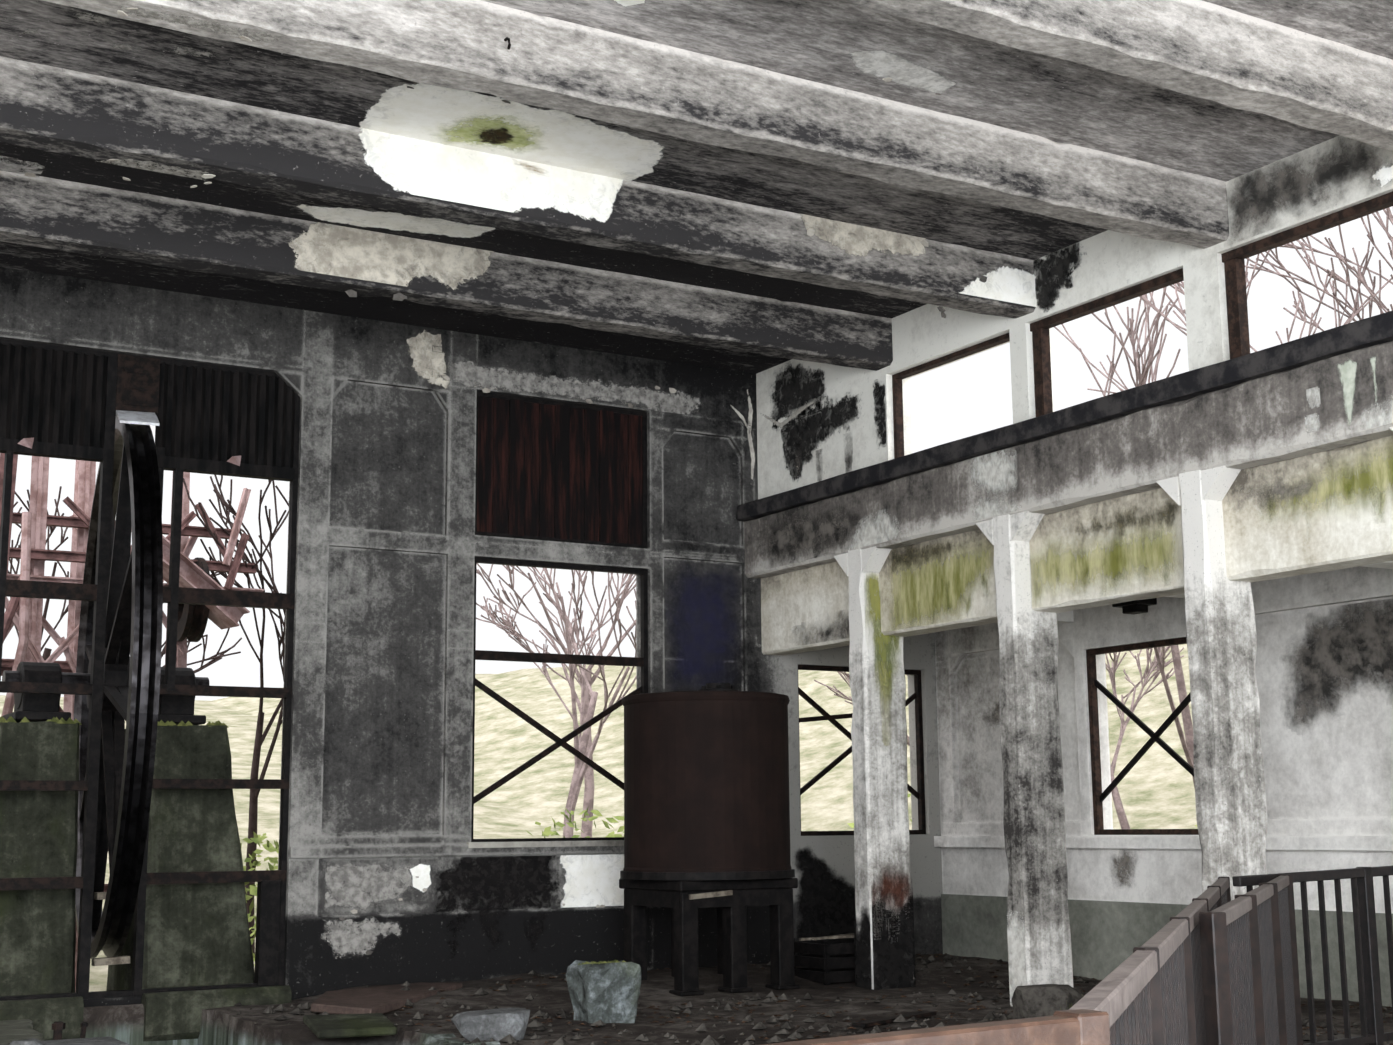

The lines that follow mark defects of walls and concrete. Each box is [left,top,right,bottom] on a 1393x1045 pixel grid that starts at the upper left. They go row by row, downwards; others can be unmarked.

peeling [358,83,664,222]
peeling [289,204,495,301]
mould [1033,242,1087,312]
peeling [407,330,700,414]
mould [771,364,886,481]
peeling [323,862,431,959]